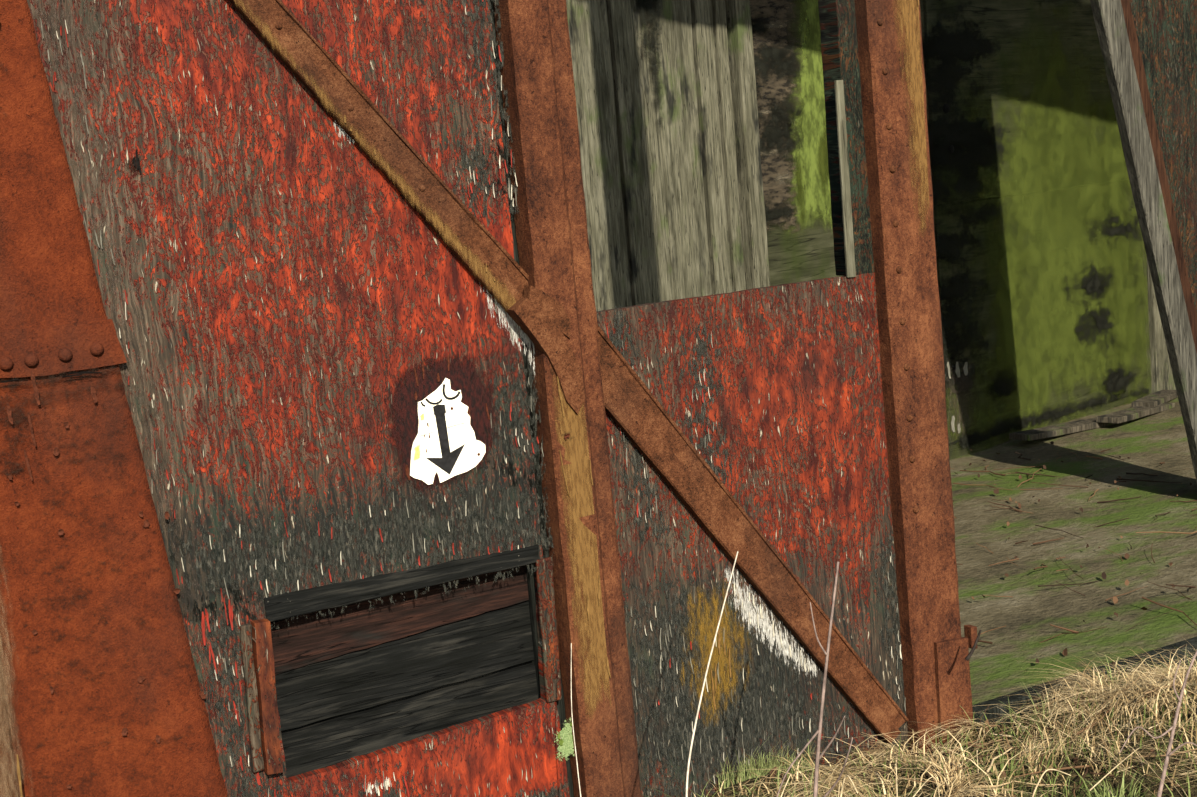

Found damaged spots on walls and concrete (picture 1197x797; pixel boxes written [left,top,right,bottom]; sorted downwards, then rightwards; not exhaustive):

peeling [40,18,87,89]
leakage [637,0,662,124]
leakage [751,17,800,92]
corrosion [897,0,929,229]
peeling [84,217,115,275]
leakage [765,202,792,222]
leakage [922,31,1024,396]
leakage [1042,57,1141,392]
peeling [139,282,554,797]
corrosion [556,376,611,712]
corrosion [683,595,743,719]
peeling [492,779,569,797]